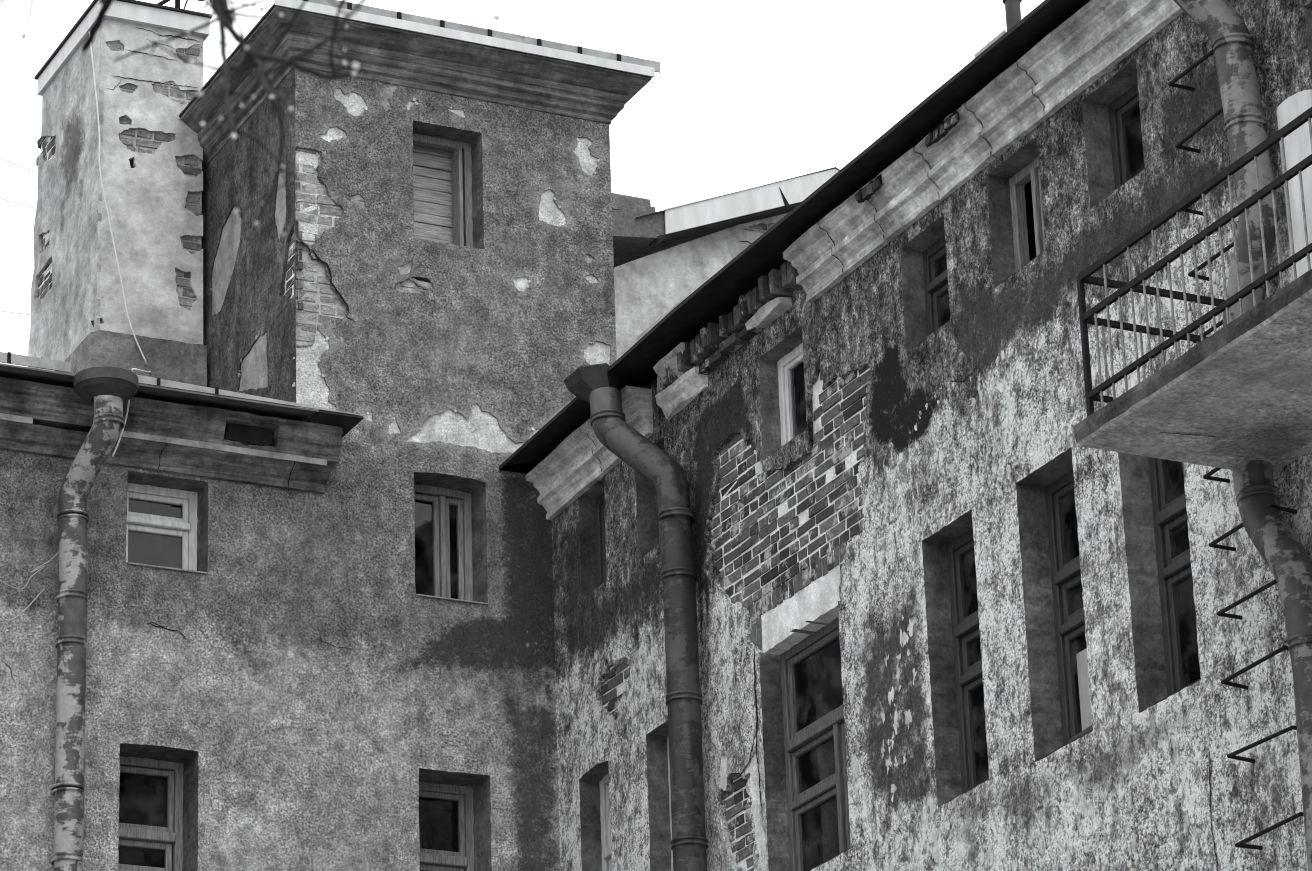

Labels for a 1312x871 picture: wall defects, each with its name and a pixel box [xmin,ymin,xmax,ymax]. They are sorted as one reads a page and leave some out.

flaking render [36,136,56,166]
flaking render [119,118,175,154]
flaking render [539,187,566,227]
flaking render [181,208,242,315]
flaking render [275,127,365,410]
crack [298,238,356,323]
flaking render [387,403,543,453]
flaking render [583,341,611,365]
damp [869,345,937,453]
flaking render [708,366,880,661]
flaking render [874,607,939,871]
flaking render [720,752,774,871]